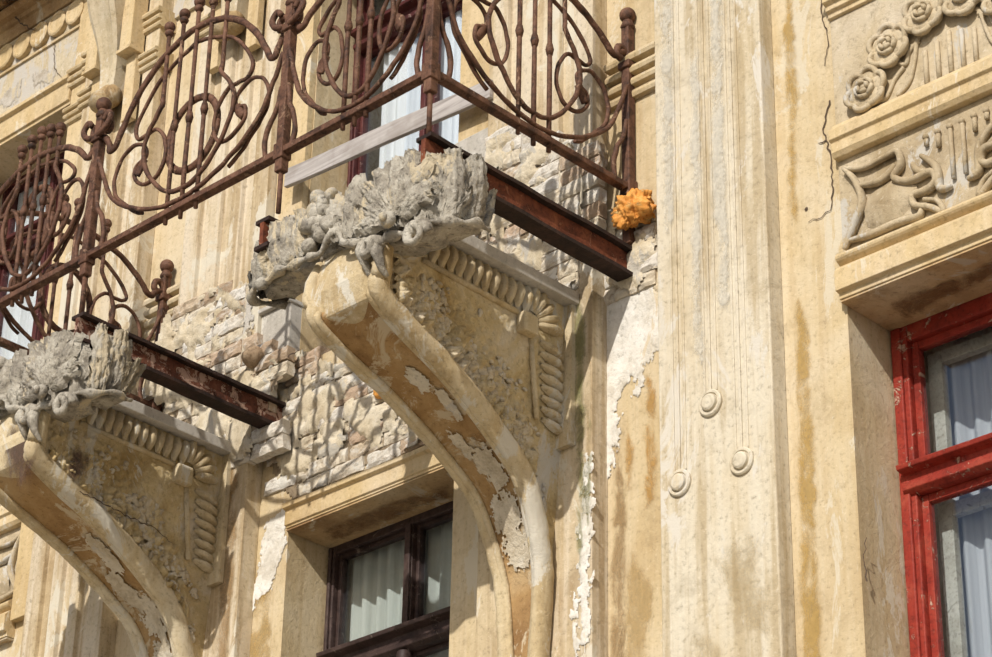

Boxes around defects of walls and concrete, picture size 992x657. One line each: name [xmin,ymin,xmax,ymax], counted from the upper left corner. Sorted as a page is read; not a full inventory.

leakage [783,5,794,51]
crack [820,0,829,66]
crack [809,100,834,222]
spalling [142,280,425,499]
spalling [475,125,659,480]
leakage [797,311,809,380]
leakage [896,264,992,316]
peeling [404,366,530,572]
leakage [800,408,816,527]
peeling [252,509,287,611]
peeling [569,451,596,657]
leakage [801,544,819,657]